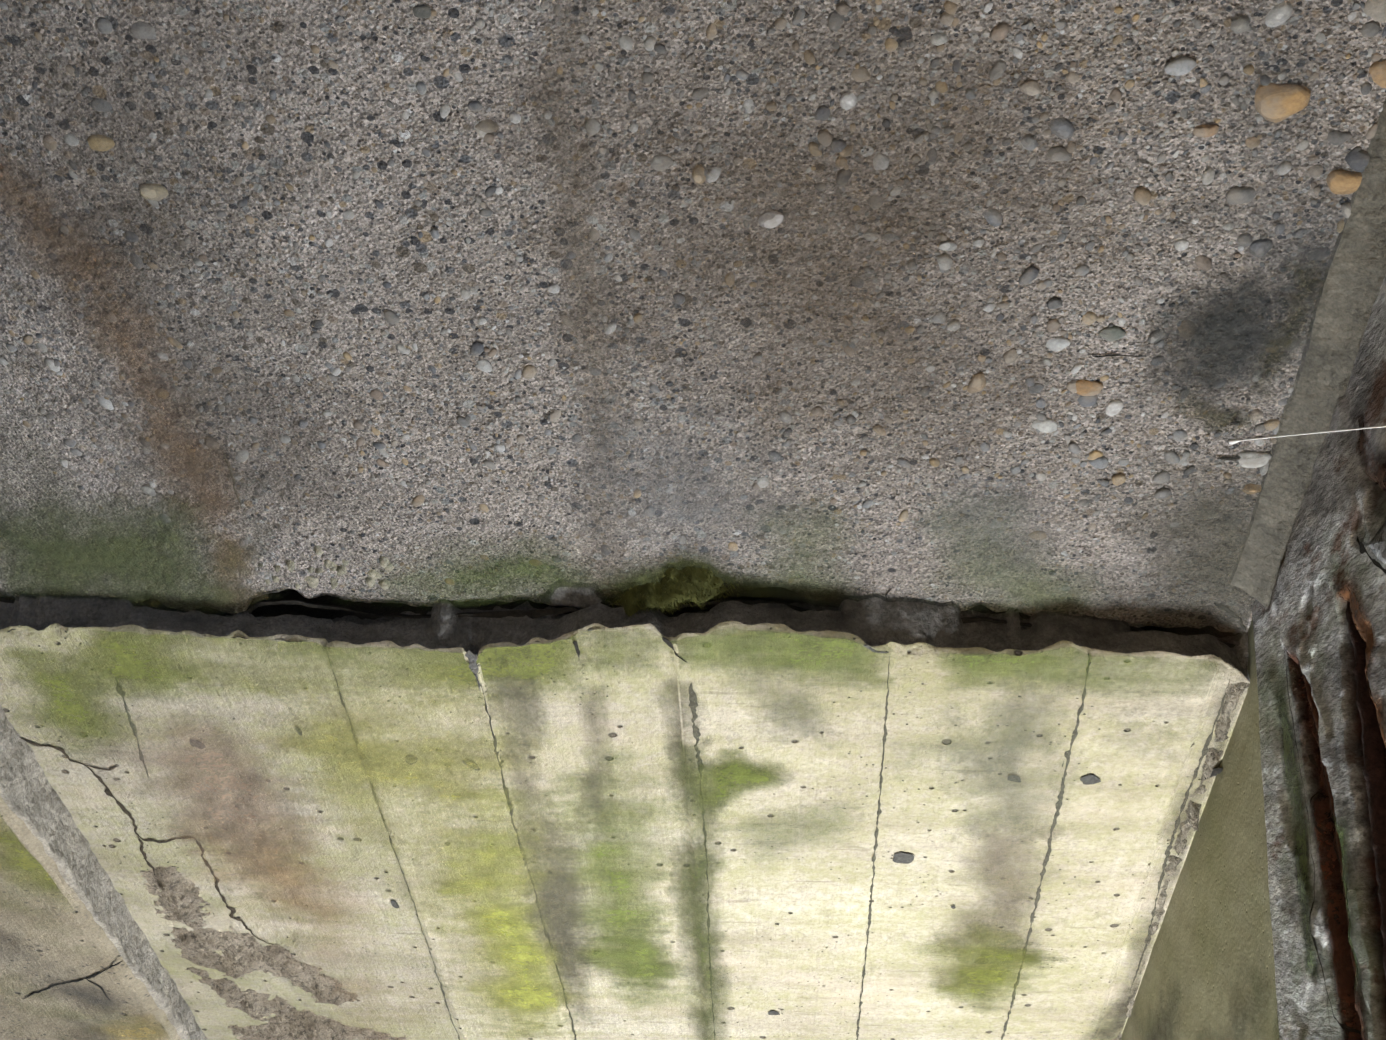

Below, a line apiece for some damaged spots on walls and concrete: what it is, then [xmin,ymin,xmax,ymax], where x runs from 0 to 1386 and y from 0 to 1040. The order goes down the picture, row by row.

damp [1153,266,1304,395]
crack [0,589,618,690]
crack [659,587,1249,673]
rust [1336,583,1386,746]
crack [20,737,274,945]
damp [535,786,670,987]
damp [965,845,1025,943]
crack [1284,655,1362,1040]
rust [1285,651,1367,1040]
crack [24,961,122,1000]